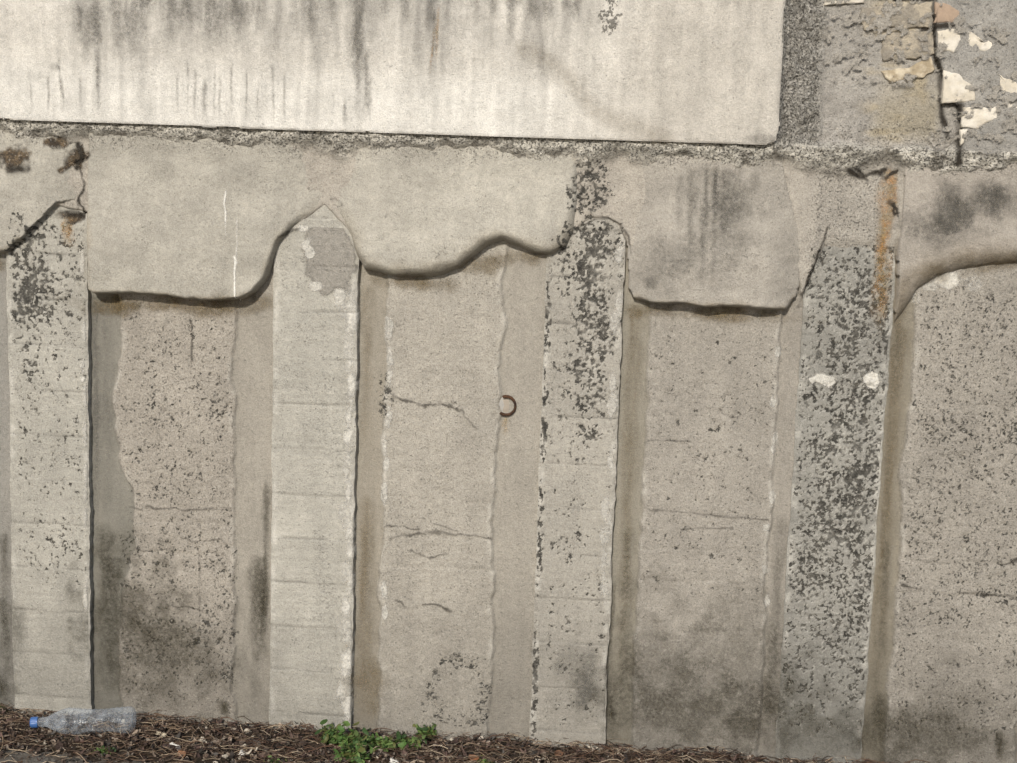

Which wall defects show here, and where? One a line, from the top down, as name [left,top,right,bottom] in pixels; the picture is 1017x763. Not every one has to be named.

water stain [354,0,363,44]
crack [893,0,963,165]
crack [77,145,87,213]